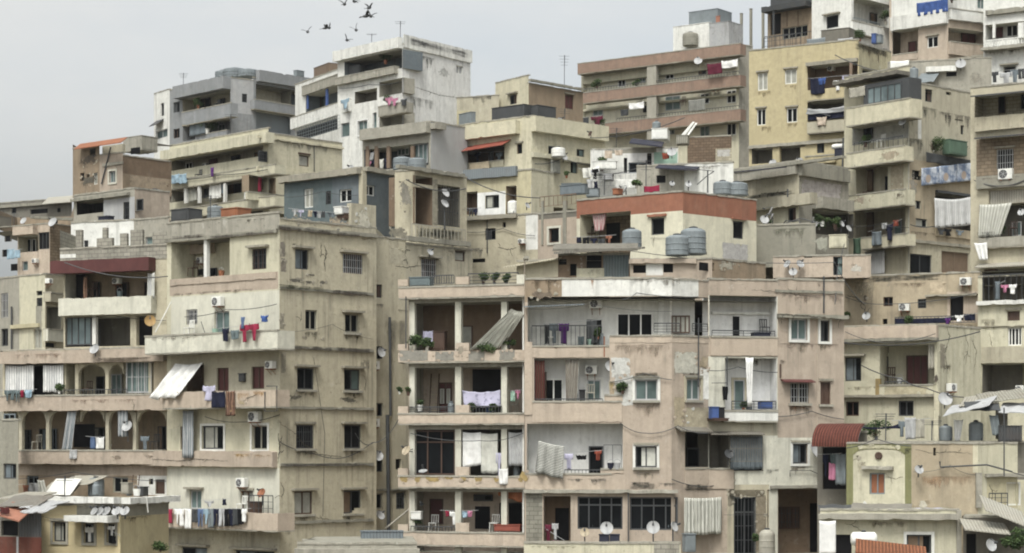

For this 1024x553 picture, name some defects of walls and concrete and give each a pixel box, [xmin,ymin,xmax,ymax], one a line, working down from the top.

peeling [611,357,633,406]
peeling [674,352,711,427]